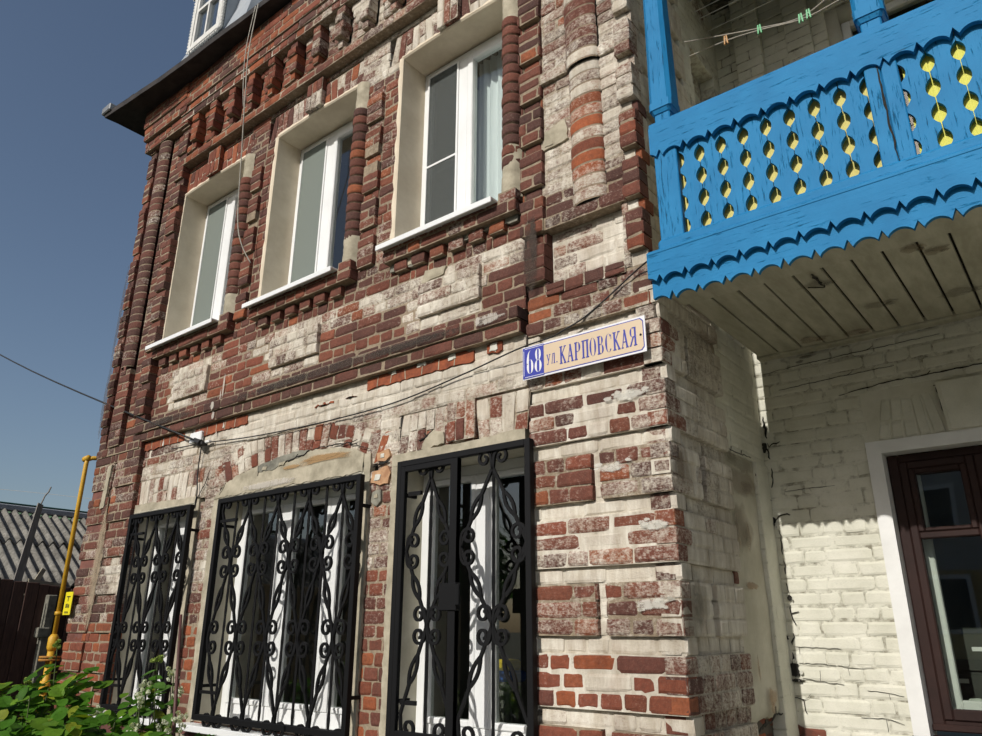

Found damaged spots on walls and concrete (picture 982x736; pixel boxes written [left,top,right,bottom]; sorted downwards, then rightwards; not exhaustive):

crack [763,334,982,413]
peeling [257,450,312,472]
crack [729,417,905,733]
flaking render [798,724,819,736]